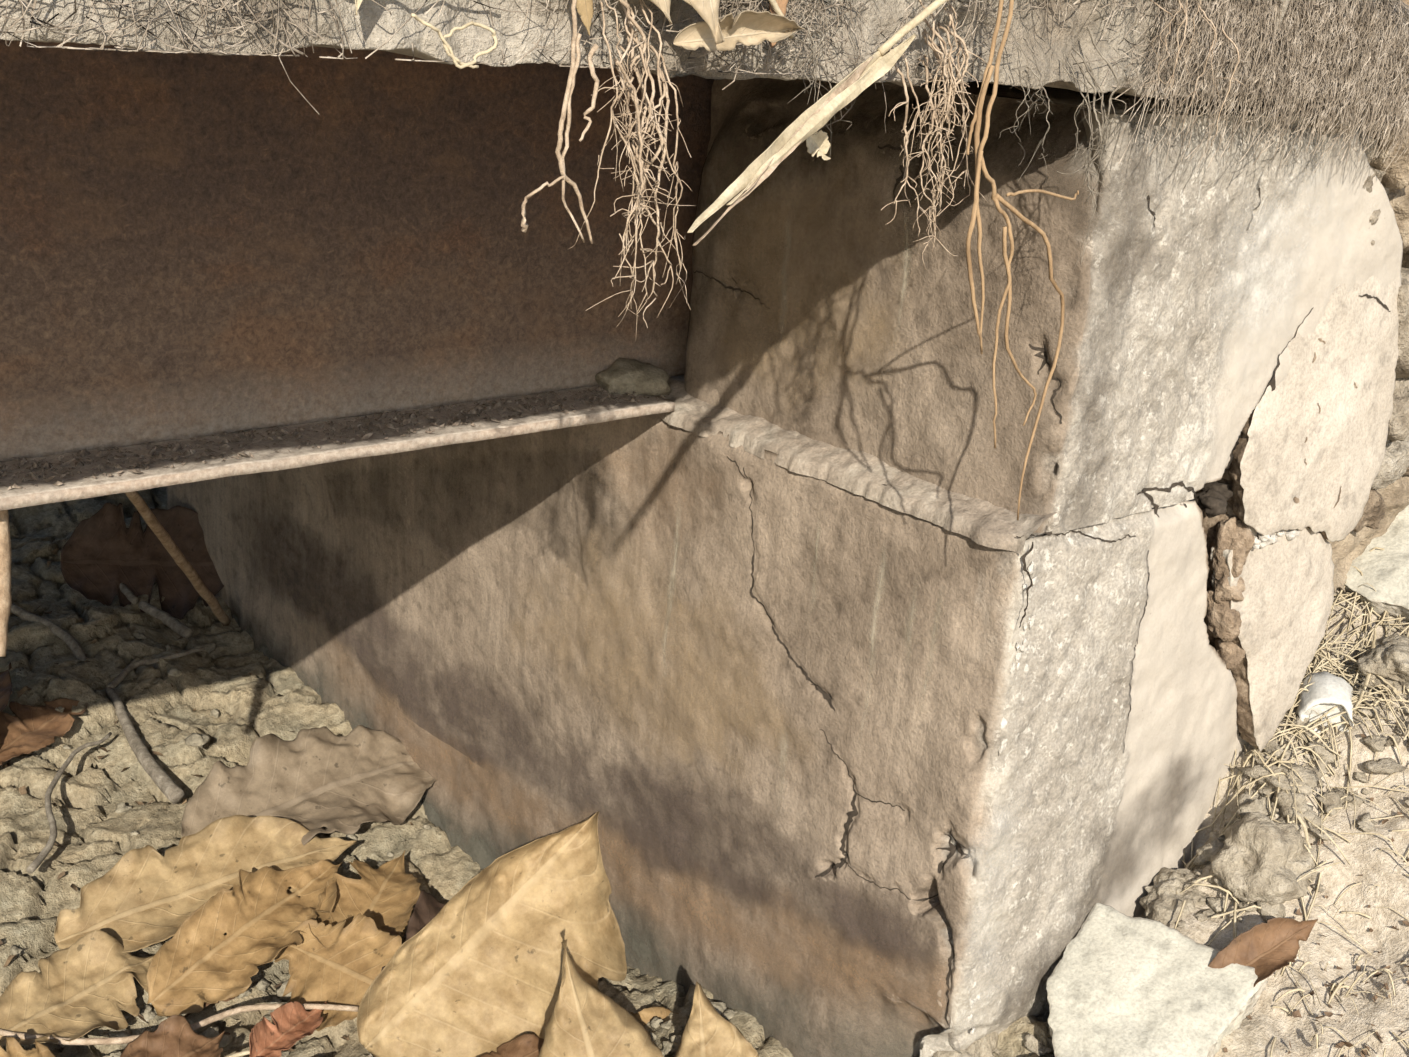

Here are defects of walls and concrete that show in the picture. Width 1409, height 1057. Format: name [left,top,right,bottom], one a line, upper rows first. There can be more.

crack [1359,294,1391,312]
crack [1029,341,1062,424]
crack [1259,308,1313,402]
crack [1224,431,1242,472]
damp [231,609,330,703]
damp [273,525,766,900]
crack [727,456,931,901]
crack [1016,481,1196,749]
flaking render [1210,527,1334,752]
damp [619,916,689,995]
damp [818,884,912,956]
damp [711,985,775,1043]